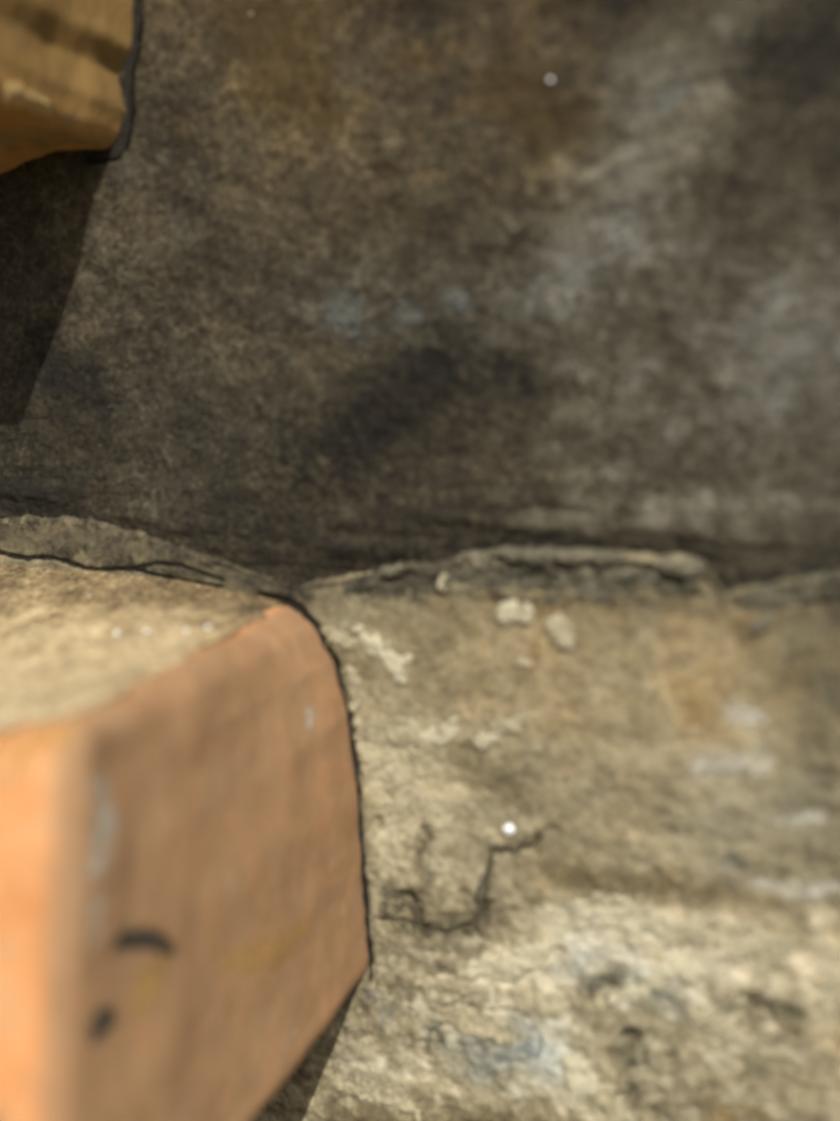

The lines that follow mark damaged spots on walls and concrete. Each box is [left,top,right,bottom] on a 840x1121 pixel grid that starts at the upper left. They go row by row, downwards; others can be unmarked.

crack [0,551,224,587]
crack [263,596,545,982]